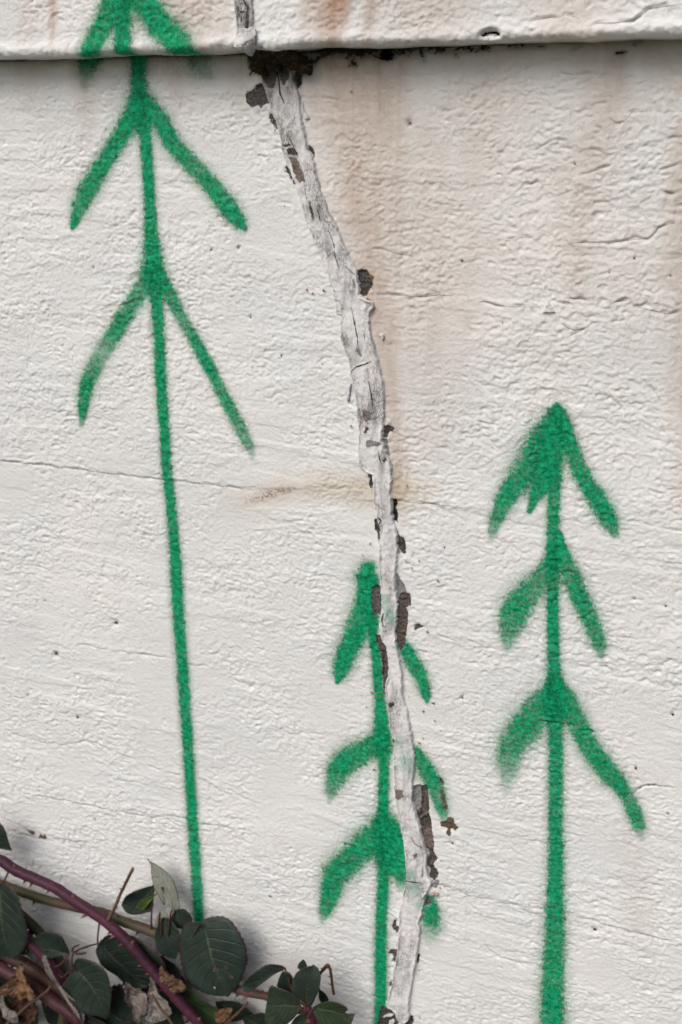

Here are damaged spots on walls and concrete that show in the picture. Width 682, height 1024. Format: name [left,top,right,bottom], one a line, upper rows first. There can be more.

spalling [245,83,278,129]
spalling [383,425,394,456]
crack [233,0,433,1023]
spalling [393,499,406,554]
spalling [371,584,382,616]
spalling [376,573,423,694]
spalling [412,778,459,905]